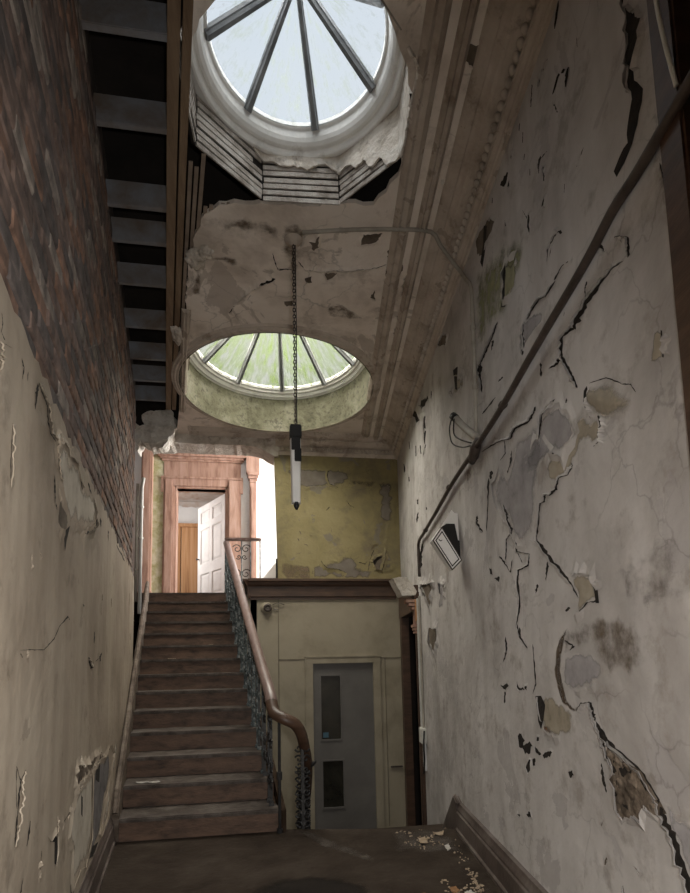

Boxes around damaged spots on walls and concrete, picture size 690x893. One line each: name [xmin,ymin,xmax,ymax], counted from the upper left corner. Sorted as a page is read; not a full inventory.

spalling [614,0,645,177]
peeling [356,232,389,280]
peeling [409,391,433,457]
peeling [54,428,98,549]
peeling [283,464,354,492]
peeling [308,553,384,579]
peeling [568,561,603,625]
peeling [500,683,571,776]
peeling [48,744,117,893]
crack [576,702,690,893]
spalling [604,744,690,867]
water stain [259,878,364,893]